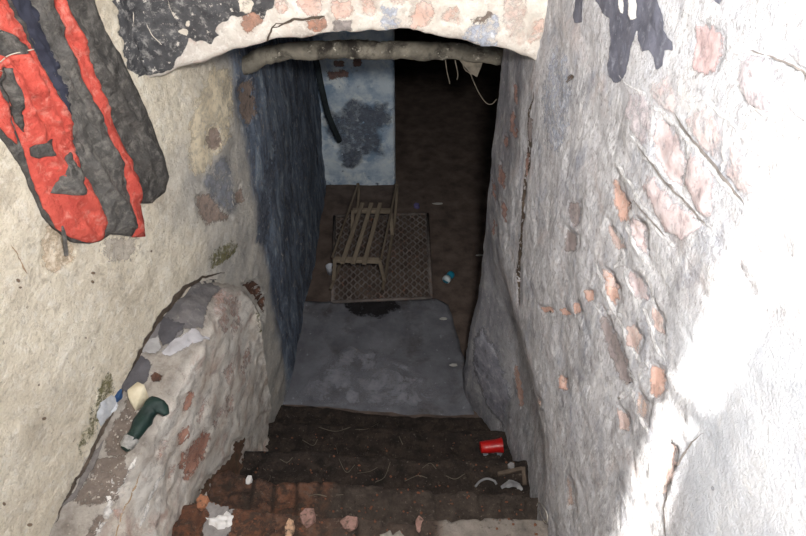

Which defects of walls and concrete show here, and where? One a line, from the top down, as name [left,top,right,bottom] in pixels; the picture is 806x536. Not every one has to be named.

spalling [238,0,263,33]
spalling [275,0,353,32]
spalling [409,0,460,29]
flaking render [692,25,806,120]
crack [516,92,534,305]
flaking render [565,202,581,252]
flaking render [593,76,762,433]
flaking render [168,391,233,480]